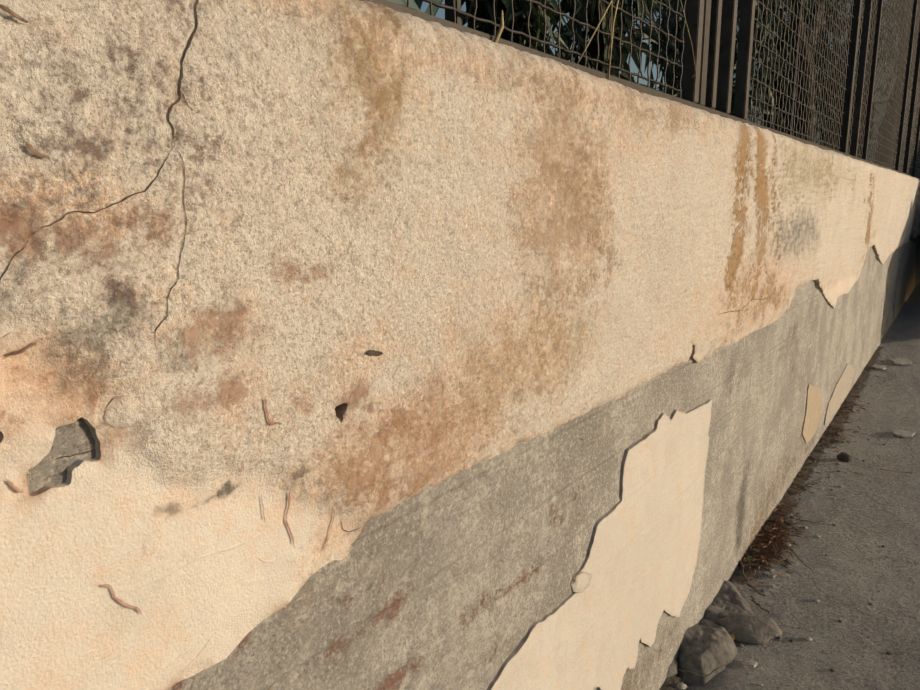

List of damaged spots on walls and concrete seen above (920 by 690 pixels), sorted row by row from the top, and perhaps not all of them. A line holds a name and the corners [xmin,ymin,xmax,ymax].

crack [0,0,199,346]
corrosion [725,124,785,320]
spalling [6,418,96,493]
spalling [169,235,920,690]
peeling [100,584,142,615]